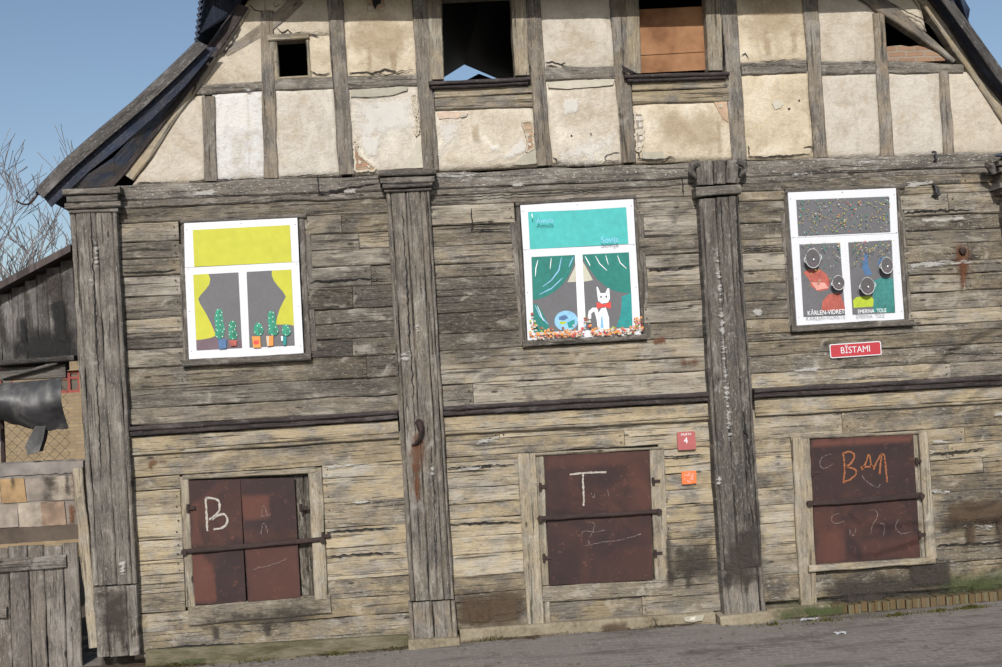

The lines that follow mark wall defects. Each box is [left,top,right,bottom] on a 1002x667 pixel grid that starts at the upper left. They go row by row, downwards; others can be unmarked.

crack [310,68,412,76]
spalling [521,120,535,153]
spalling [633,112,645,153]
spalling [353,142,376,173]
corrosion [411,433,424,499]